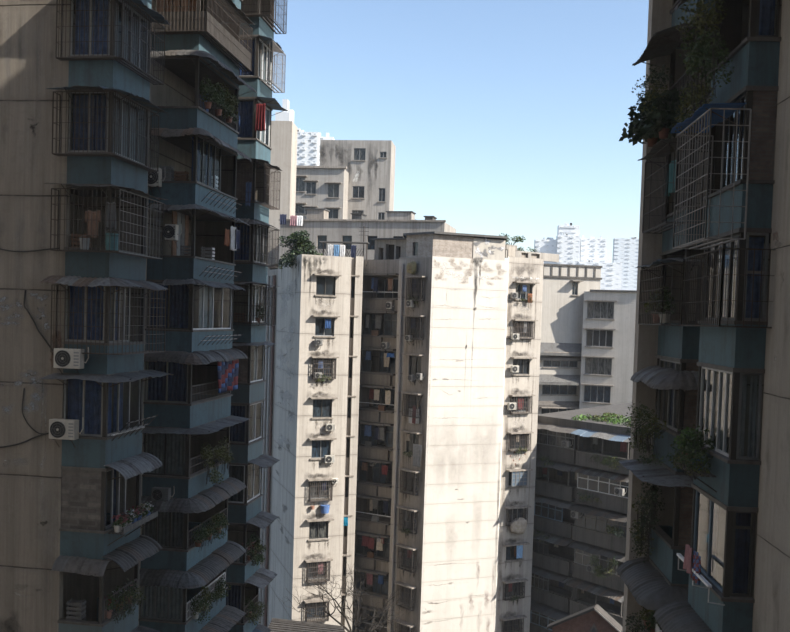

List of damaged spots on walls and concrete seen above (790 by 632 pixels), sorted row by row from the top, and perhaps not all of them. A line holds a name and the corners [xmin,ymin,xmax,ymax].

leakage [336,150,377,182]